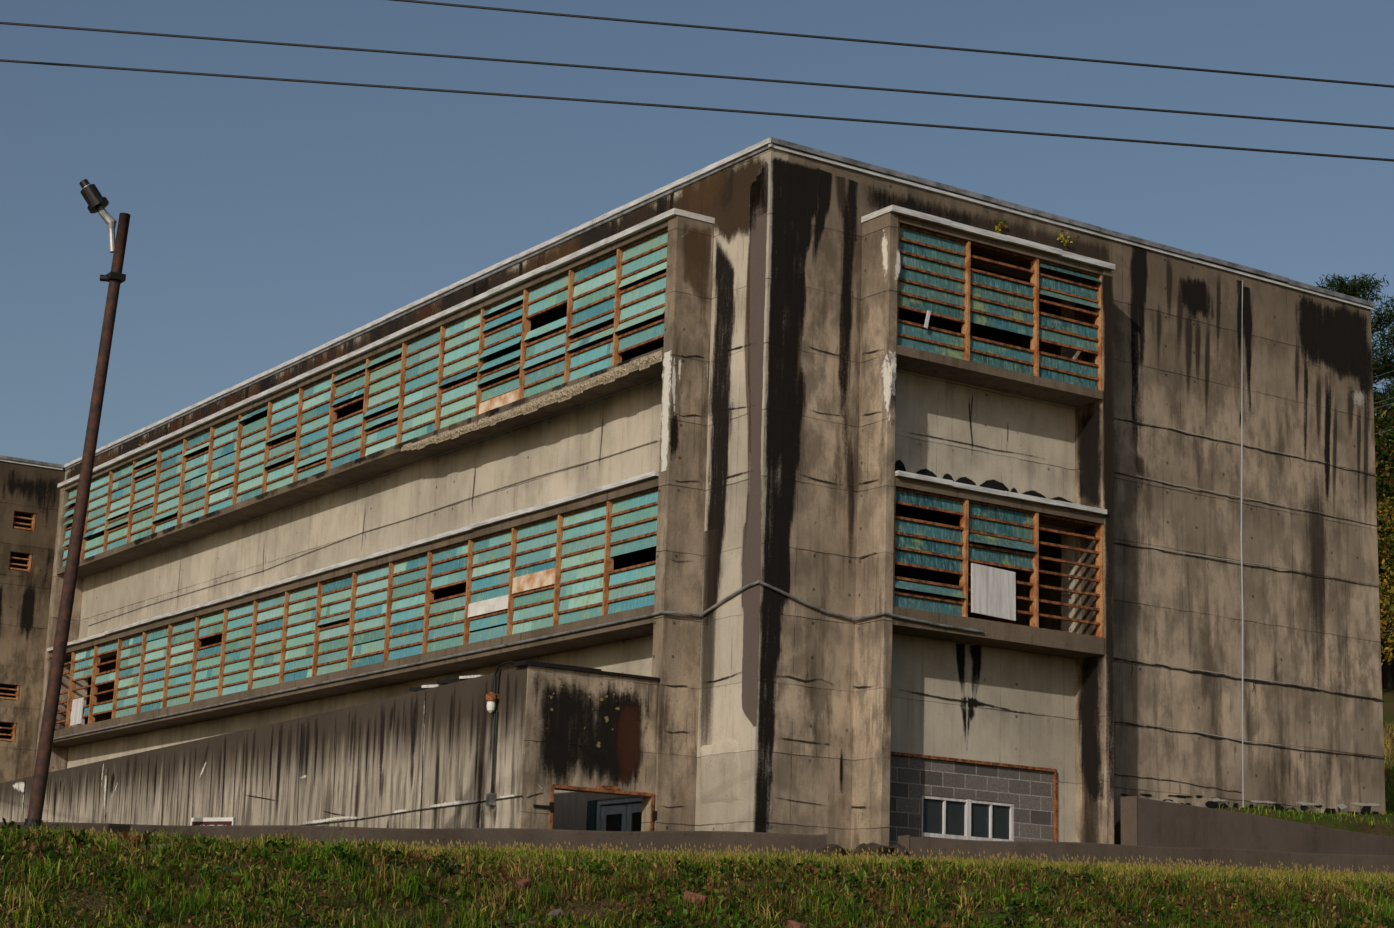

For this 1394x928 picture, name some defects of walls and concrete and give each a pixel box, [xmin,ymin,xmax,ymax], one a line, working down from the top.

water stain [0,157,1115,843]
water stain [1130,246,1220,437]
water stain [1237,280,1252,426]
water stain [1295,297,1373,654]